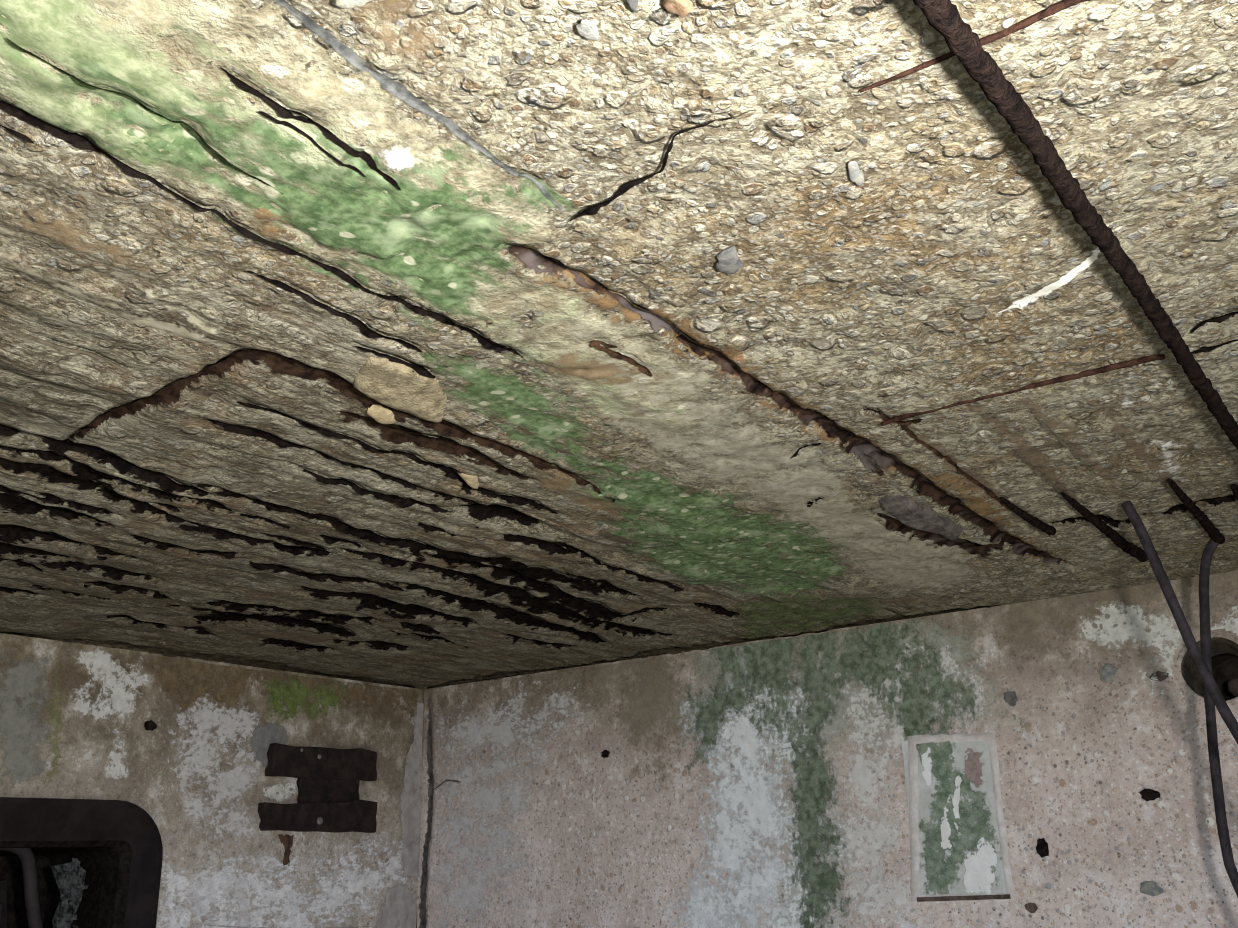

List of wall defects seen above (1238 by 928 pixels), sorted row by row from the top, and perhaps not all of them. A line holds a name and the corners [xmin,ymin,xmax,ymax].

leakage [0,252,230,347]
crack [6,37,283,194]
crack [0,101,525,379]
crack [220,67,401,190]
crack [589,340,653,377]
crack [569,117,732,222]
leakage [573,326,971,588]
crack [0,401,1011,928]
leakage [71,650,417,841]
leakage [430,584,1189,928]
leakage [156,836,407,928]
rust [278,834,294,865]